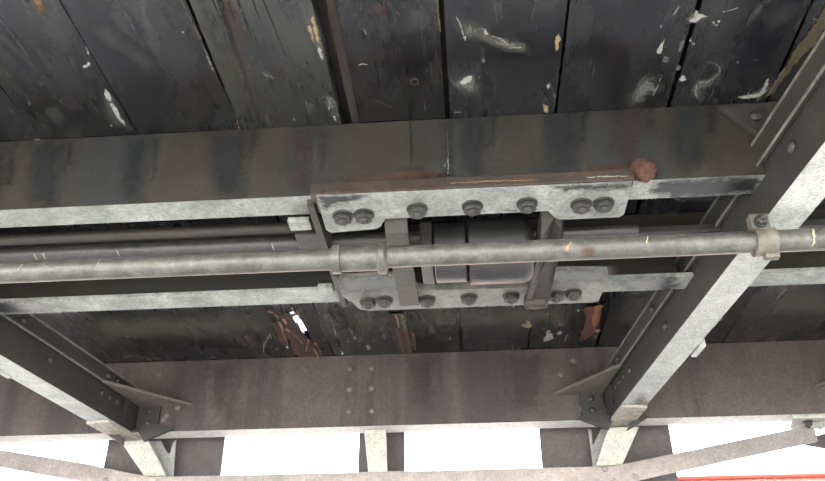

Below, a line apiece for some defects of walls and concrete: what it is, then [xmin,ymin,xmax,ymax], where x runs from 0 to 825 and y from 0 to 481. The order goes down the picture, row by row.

peeling [688,7,738,26]
peeling [307,15,323,60]
peeling [456,17,525,50]
peeling [634,73,662,102]
peeling [694,62,721,100]
peeling [738,78,769,99]
peeling [104,89,125,127]
rust [587,158,657,183]